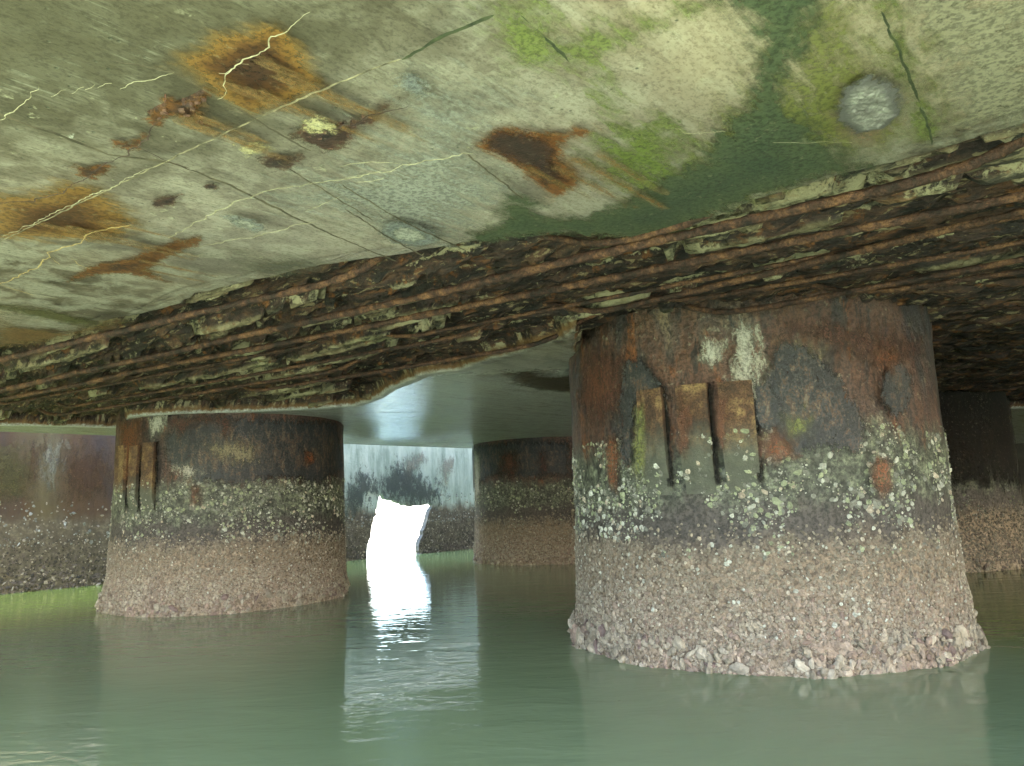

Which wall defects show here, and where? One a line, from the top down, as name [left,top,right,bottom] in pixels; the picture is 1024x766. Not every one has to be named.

crack [2,73,173,120]
crack [219,12,309,99]
rust [111,24,422,171]
crack [4,121,190,236]
rust [0,165,201,282]
crack [169,153,472,247]
rust [476,127,666,208]
spalling [0,112,1024,492]
efflorescence [725,320,771,399]
rust [715,397,728,449]
water stain [344,452,454,521]
rust [869,456,893,498]